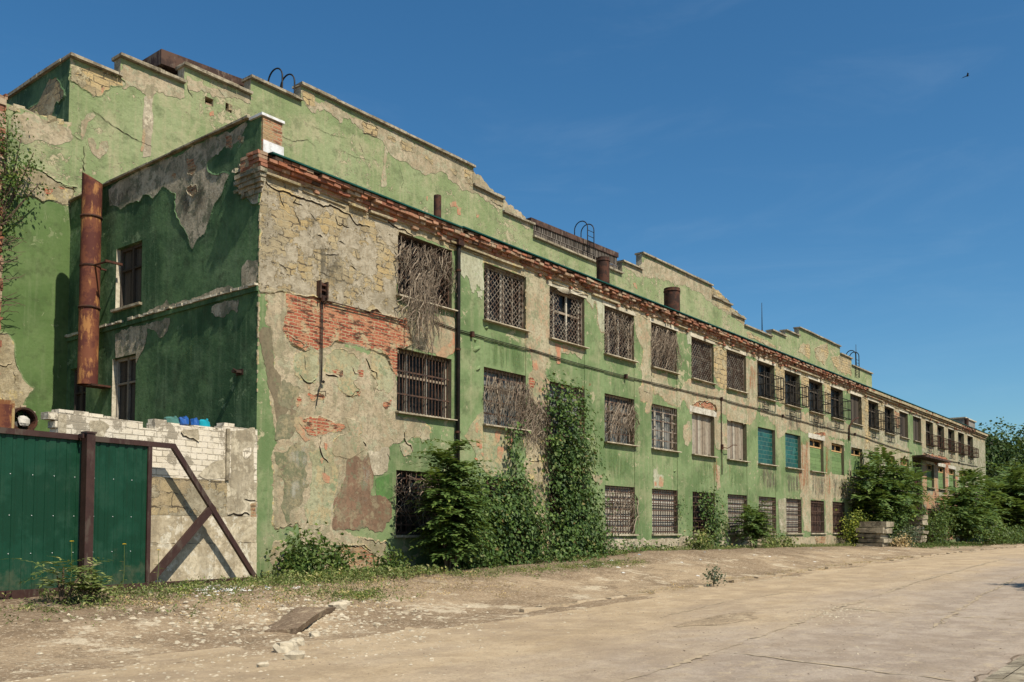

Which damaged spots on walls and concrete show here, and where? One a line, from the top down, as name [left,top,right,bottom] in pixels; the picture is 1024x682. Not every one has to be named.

peeling [9,64,251,159]
peeling [4,164,75,206]
peeling [301,90,531,230]
peeling [0,331,35,408]
crack [300,356,378,397]
spalling [108,121,986,573]